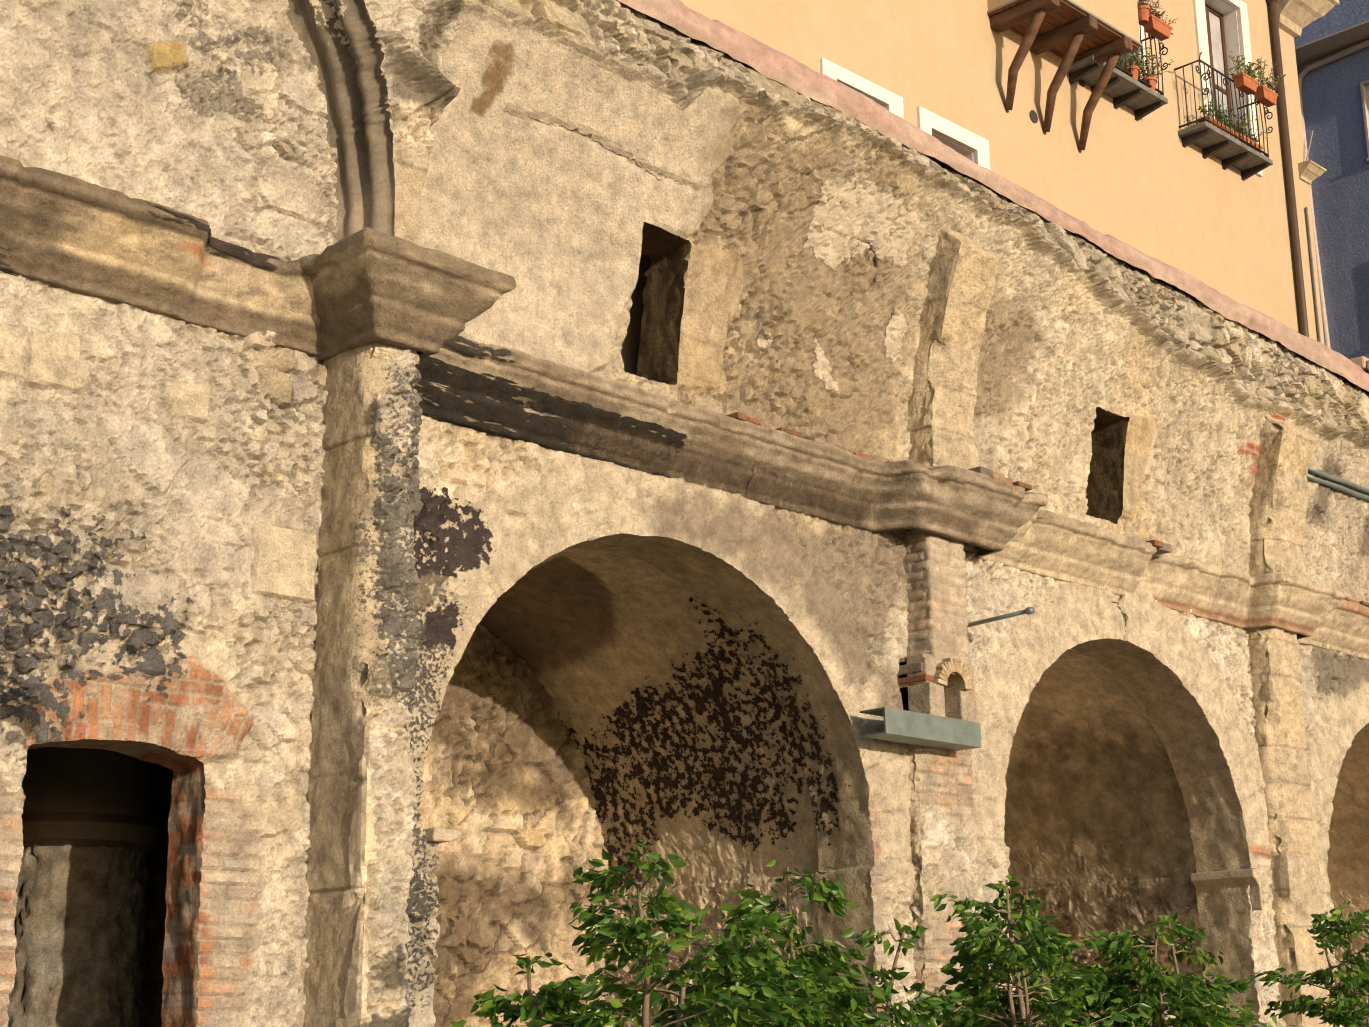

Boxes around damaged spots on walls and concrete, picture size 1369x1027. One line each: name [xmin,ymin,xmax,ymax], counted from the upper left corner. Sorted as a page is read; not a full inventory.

damp [0,474,196,744]
damp [352,361,590,1027]
damp [705,600,850,846]